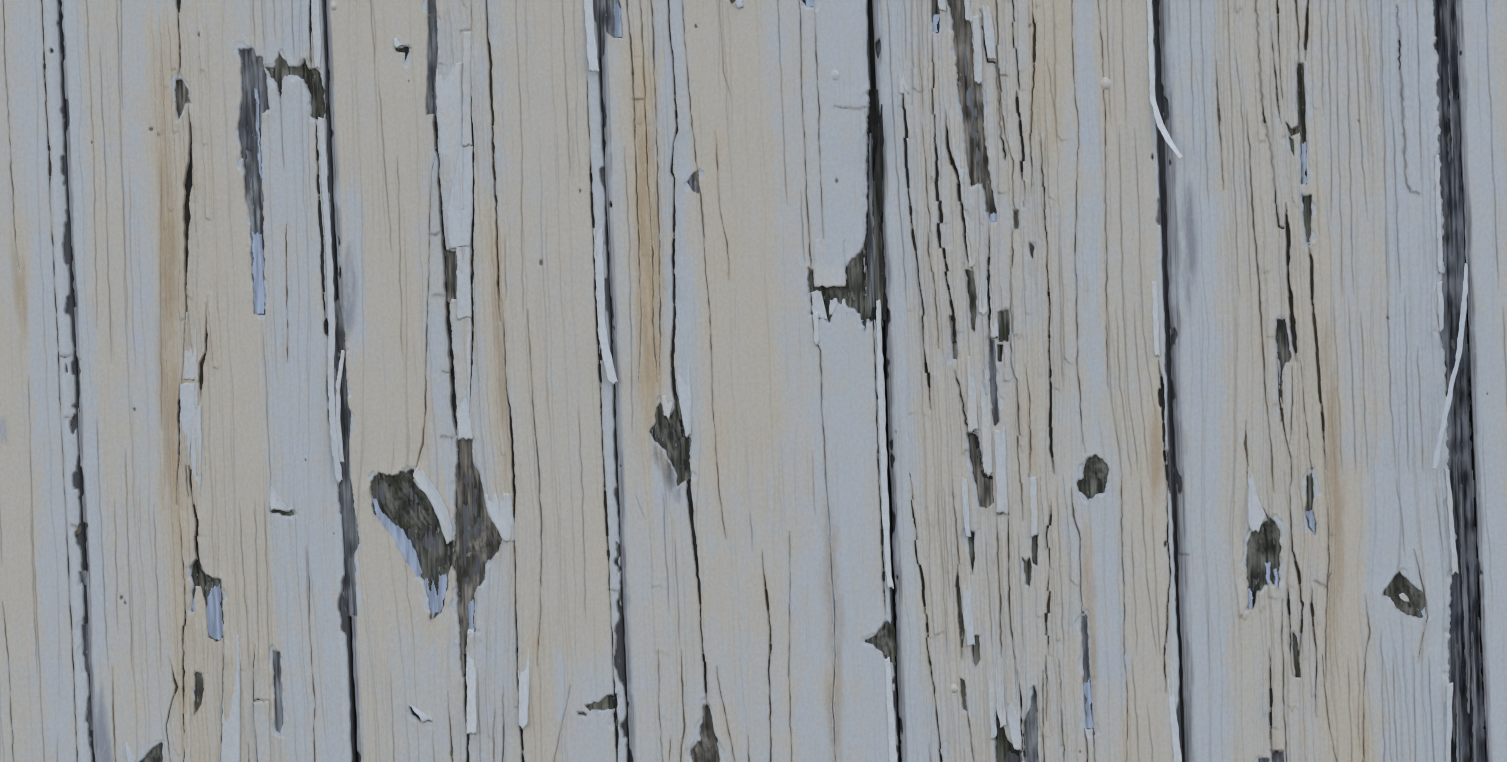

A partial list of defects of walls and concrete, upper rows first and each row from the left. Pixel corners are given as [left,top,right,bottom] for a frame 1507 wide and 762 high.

crack [166,123,208,762]
peeling [184,558,241,762]
peeling [238,0,359,617]
peeling [413,467,453,544]
crack [418,0,542,762]
crack [587,82,619,762]
peeling [691,705,720,762]
crack [627,0,792,762]
crack [817,345,826,464]
crack [829,564,837,743]
peeling [808,88,894,589]
peeling [932,0,1038,762]